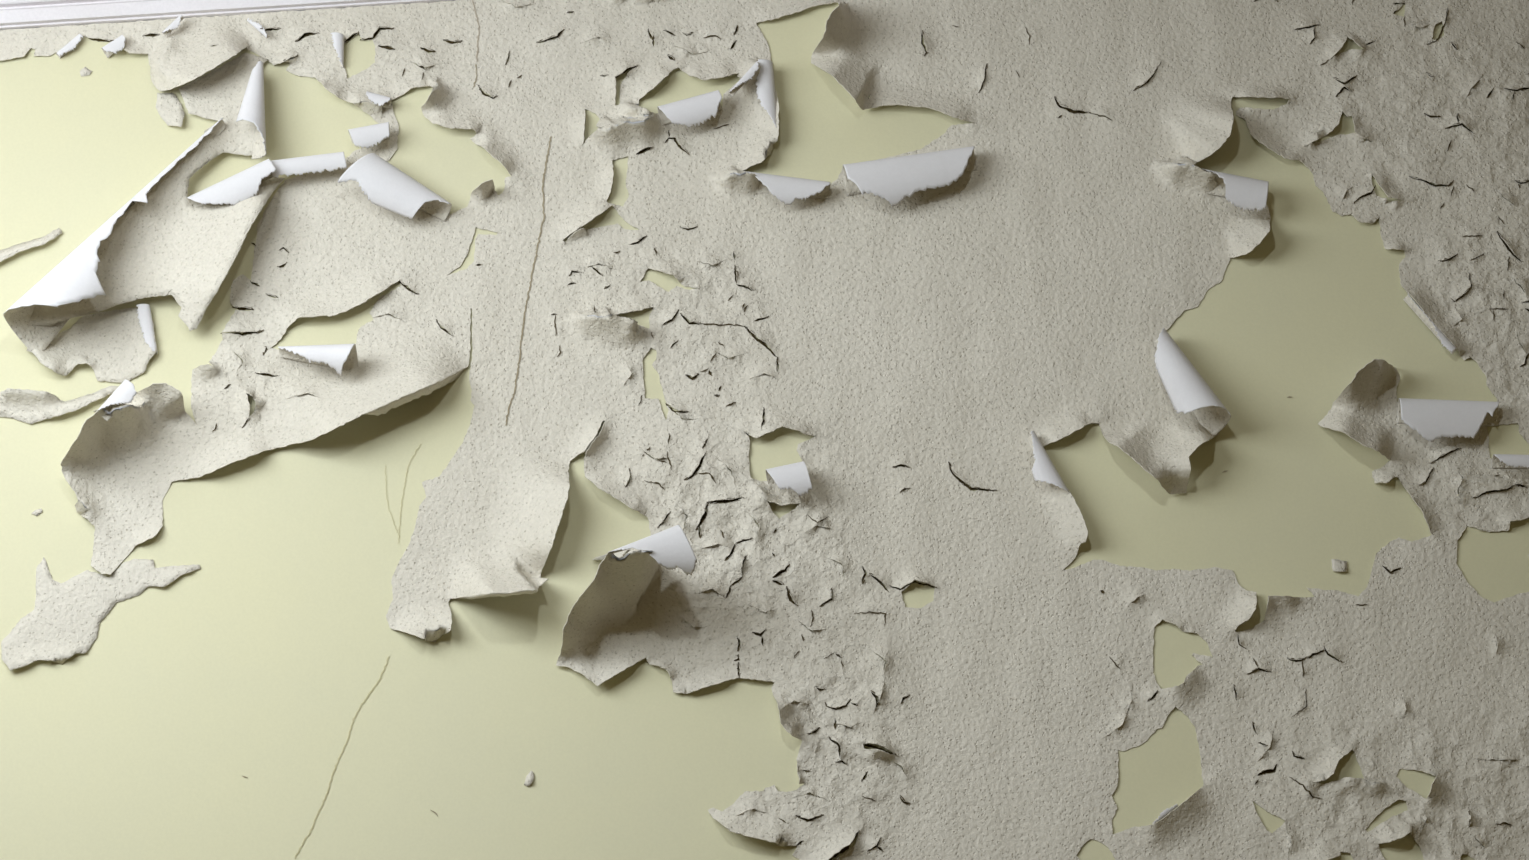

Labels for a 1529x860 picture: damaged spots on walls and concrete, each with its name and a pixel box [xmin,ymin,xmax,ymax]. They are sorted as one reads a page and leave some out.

crack [505,136,696,425]
crack [1255,0,1372,97]
crack [1394,3,1456,77]
crack [1411,41,1529,322]
peeling [0,0,856,860]
crack [626,252,937,860]
peeling [564,0,1529,860]